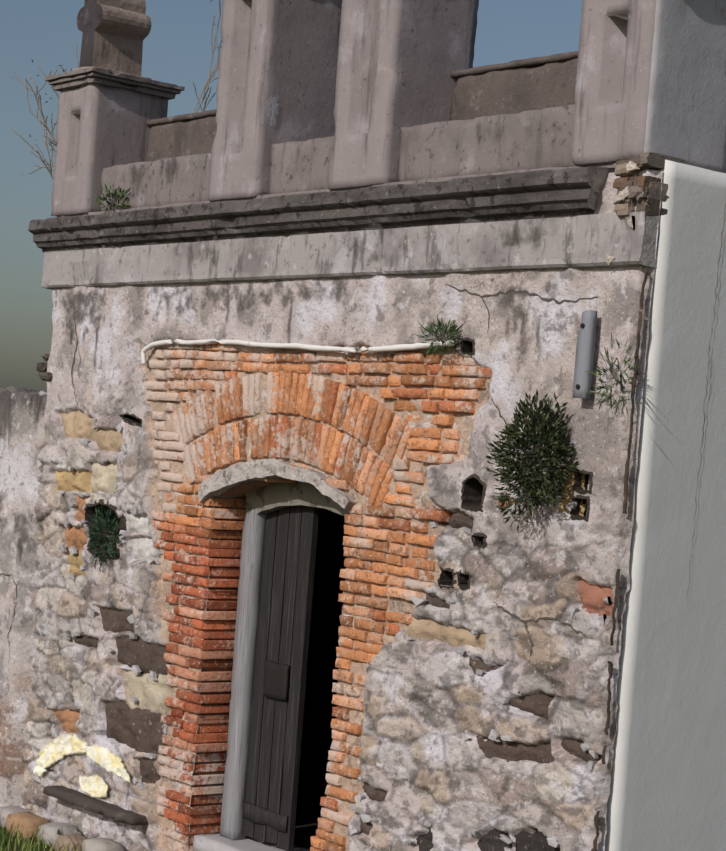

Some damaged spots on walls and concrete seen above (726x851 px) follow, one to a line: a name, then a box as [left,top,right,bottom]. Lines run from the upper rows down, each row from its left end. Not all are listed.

spalling [613,152,687,229]
water stain [64,292,104,347]
water stain [206,279,310,333]
crack [445,284,598,332]
spalling [623,269,648,514]
crack [0,573,17,662]
flaking render [33,342,504,851]
spalling [566,569,621,646]
spalling [493,688,555,720]
spalling [461,729,555,764]
spalling [561,739,607,771]
spalling [470,828,560,851]